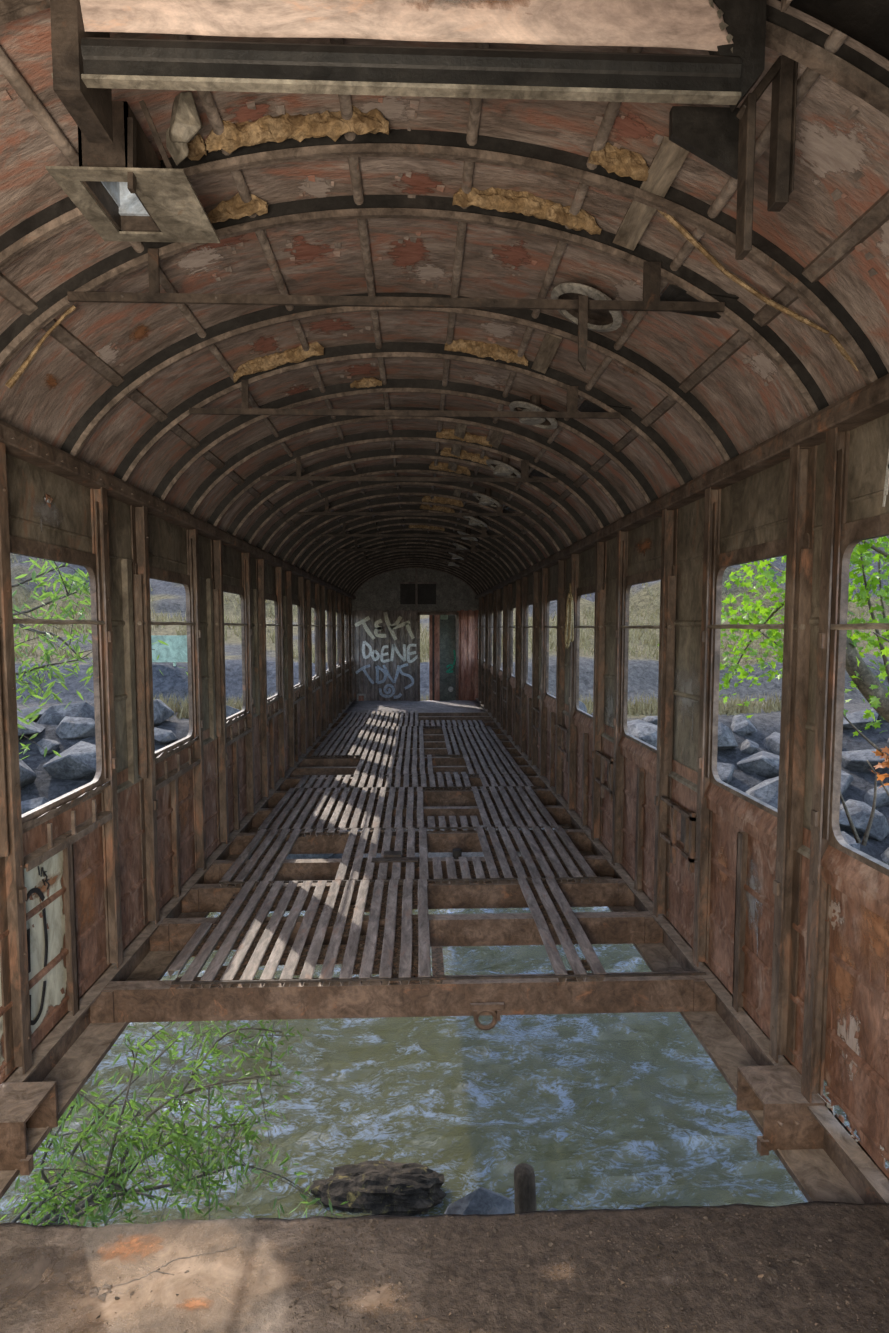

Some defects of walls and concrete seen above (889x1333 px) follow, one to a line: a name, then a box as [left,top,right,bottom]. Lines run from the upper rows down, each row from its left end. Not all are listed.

peeling [795,105,881,202]
peeling [831,1006,861,1081]